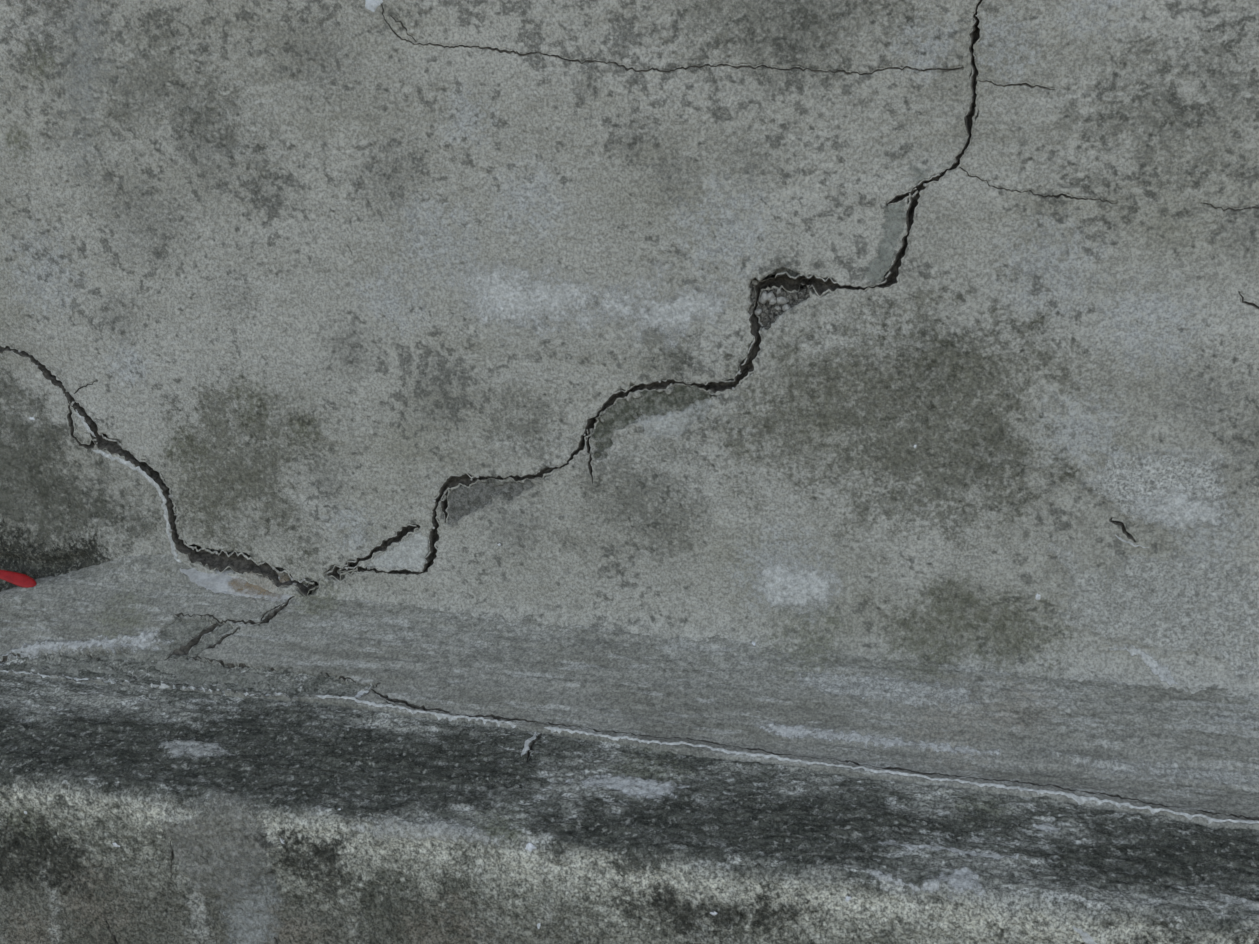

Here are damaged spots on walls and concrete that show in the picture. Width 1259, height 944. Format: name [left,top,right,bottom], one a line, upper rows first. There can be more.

crack [1201,202,1259,212]
crack [0,0,1118,671]
crack [1239,293,1259,309]
crack [1111,518,1149,548]
spalling [0,618,371,700]
crack [0,652,1259,824]
leakage [0,703,547,897]
leakage [225,867,279,944]
leakage [530,789,1025,943]
leakage [1047,821,1259,901]
leakage [1134,913,1193,944]